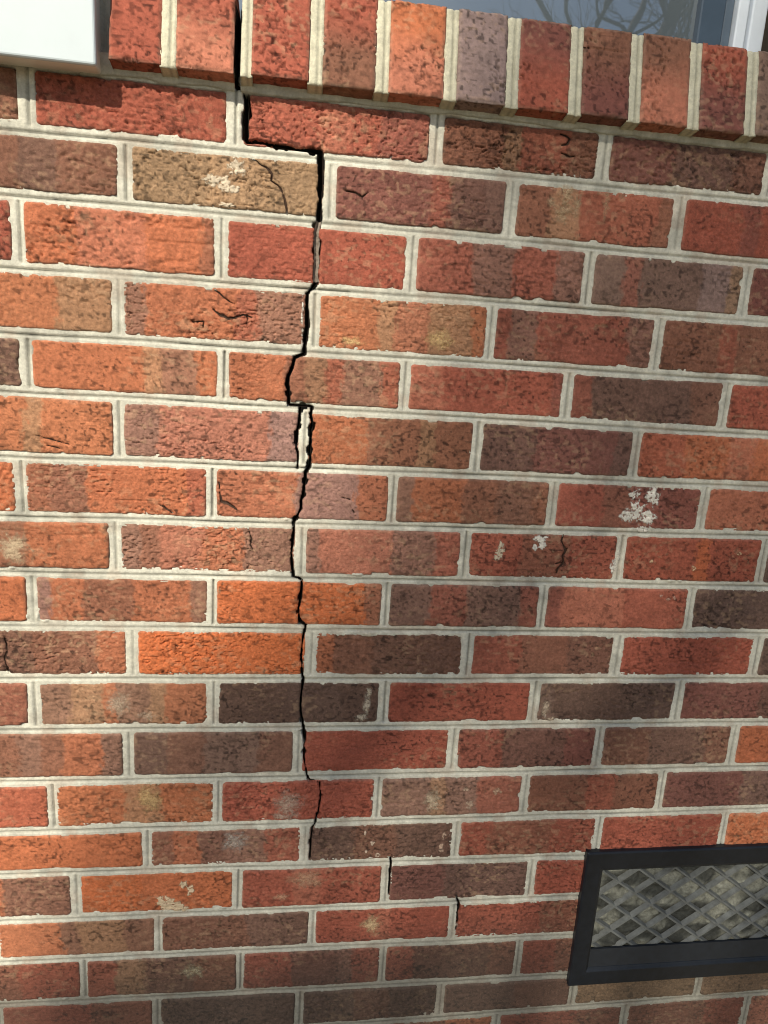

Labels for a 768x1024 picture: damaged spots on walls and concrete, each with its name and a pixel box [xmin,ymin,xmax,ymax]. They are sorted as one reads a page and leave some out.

crack [235,5,369,856]
crack [555,534,570,573]
crack [386,857,394,891]